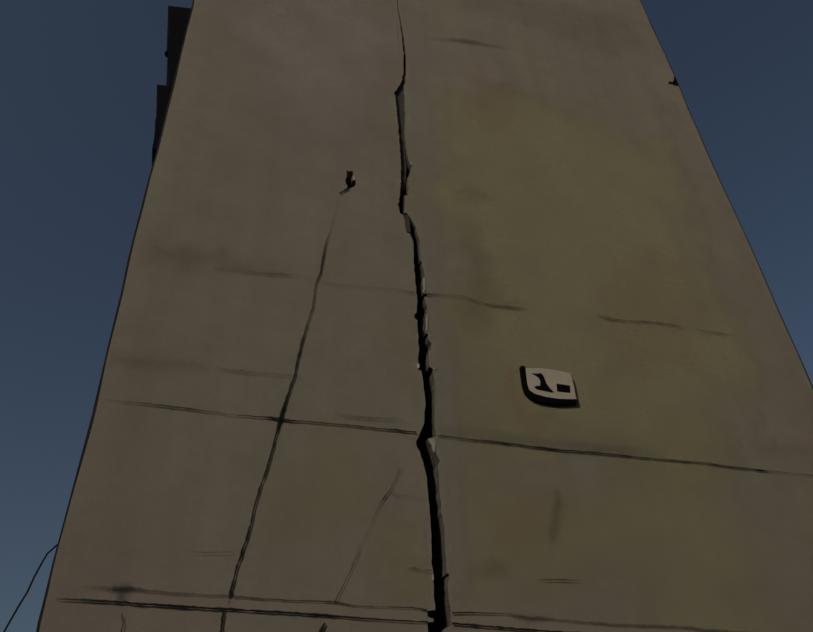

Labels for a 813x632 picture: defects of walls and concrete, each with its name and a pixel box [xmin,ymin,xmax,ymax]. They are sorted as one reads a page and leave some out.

crack [60,0,564,632]